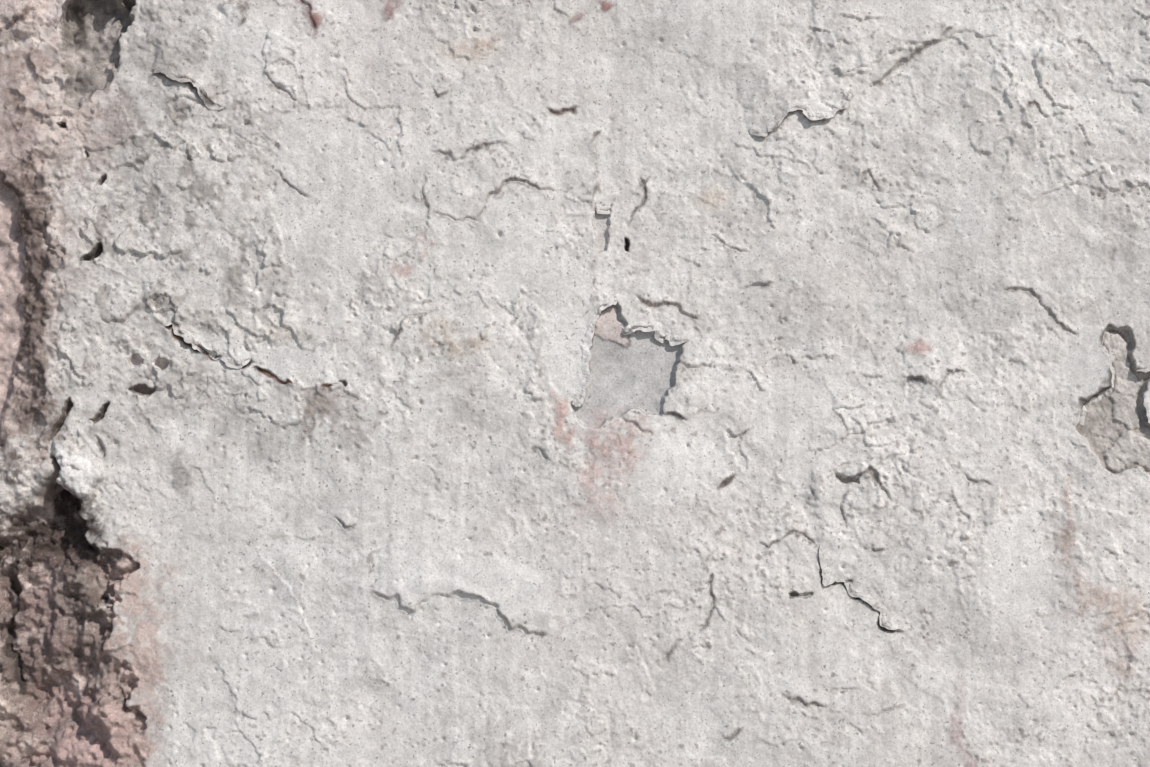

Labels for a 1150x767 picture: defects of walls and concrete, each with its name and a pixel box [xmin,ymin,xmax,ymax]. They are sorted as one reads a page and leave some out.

spalling [51,0,135,109]
crack [634,179,647,211]
spalling [80,242,103,261]
flaking render [0,173,31,425]
spalling [128,384,157,396]
spalling [128,354,169,371]
crack [159,315,292,384]
spalling [570,294,689,429]
spalling [1076,325,1150,475]
crack [842,467,879,524]
spalling [0,397,149,767]
crack [819,543,907,632]